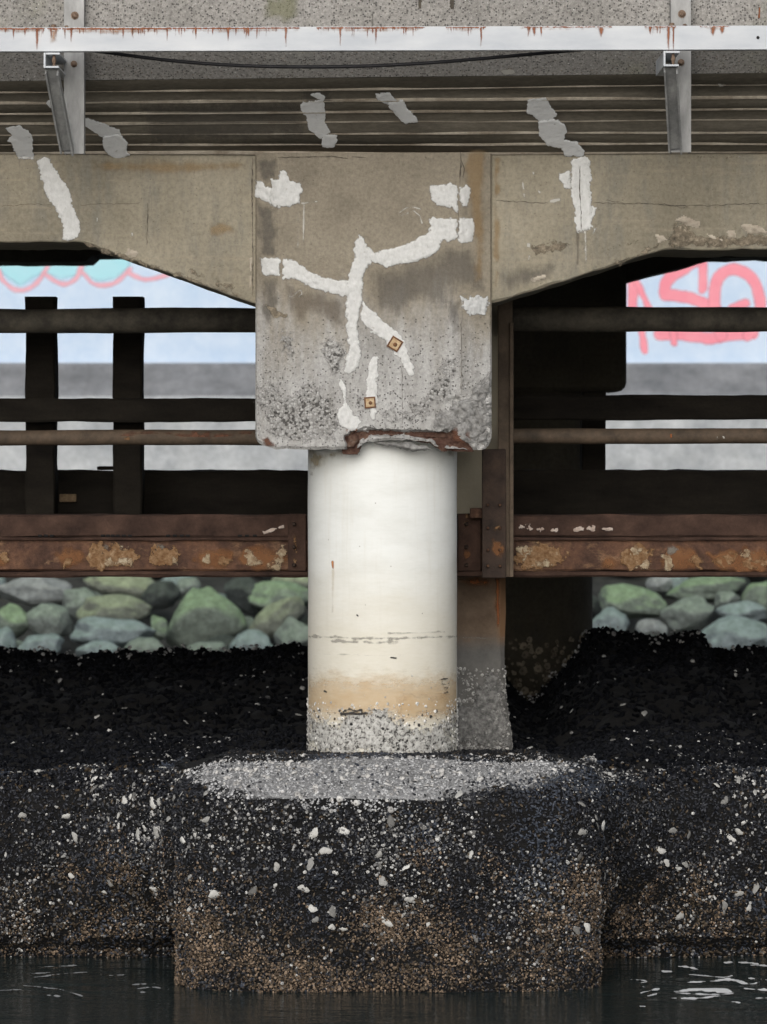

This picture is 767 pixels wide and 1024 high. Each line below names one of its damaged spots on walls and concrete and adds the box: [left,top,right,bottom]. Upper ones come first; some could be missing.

corrosion [0,27,299,44]
corrosion [317,27,425,37]
spalling [608,215,767,264]